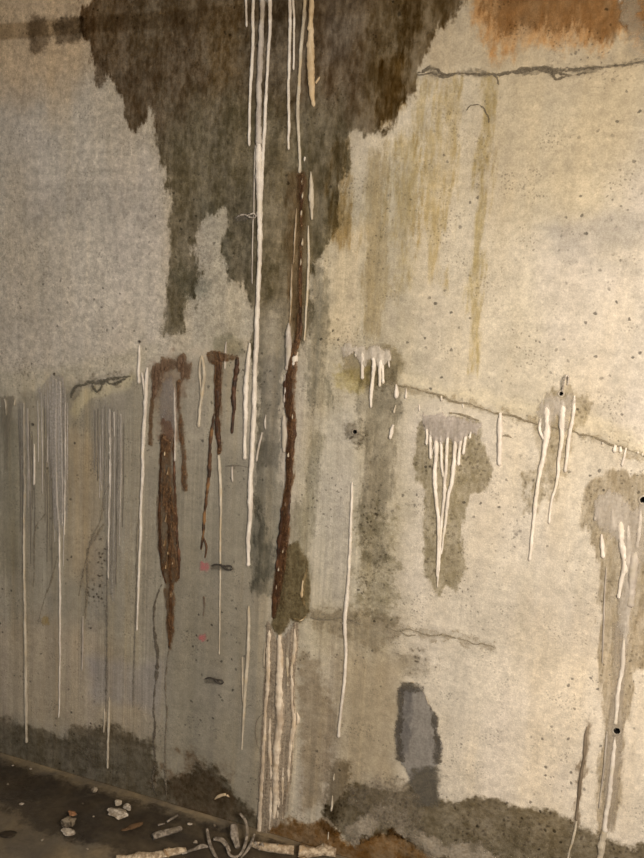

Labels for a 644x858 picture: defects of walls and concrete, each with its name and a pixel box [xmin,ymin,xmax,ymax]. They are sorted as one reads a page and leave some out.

crack [417,58,643,85]
water stain [53,0,459,566]
corrosion [148,353,190,649]
corrosion [200,351,240,558]
corrosion [272,173,306,619]
water stain [418,404,482,588]
crack [391,384,644,460]
water stain [528,396,576,561]
water stain [214,606,300,833]
corrosion [267,819,430,858]
spalling [392,682,443,818]
water stain [324,482,644,858]